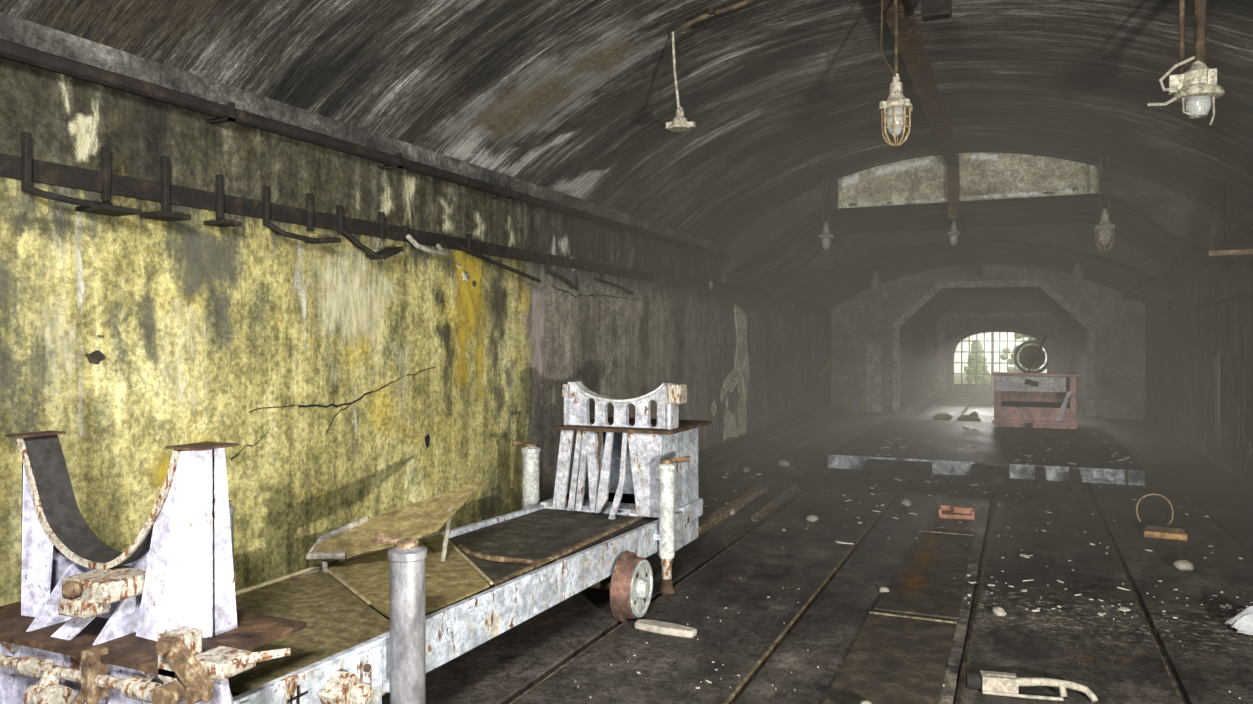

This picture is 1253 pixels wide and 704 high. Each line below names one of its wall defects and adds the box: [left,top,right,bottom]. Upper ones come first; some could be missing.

leakage [0,257,75,440]
leakage [9,199,89,303]
leakage [109,309,125,376]
leakage [139,205,243,412]
leakage [295,254,306,317]
crack [230,367,435,460]
leakage [322,254,394,337]
leakage [438,324,453,413]
leakage [486,279,513,437]
leakage [531,289,545,385]